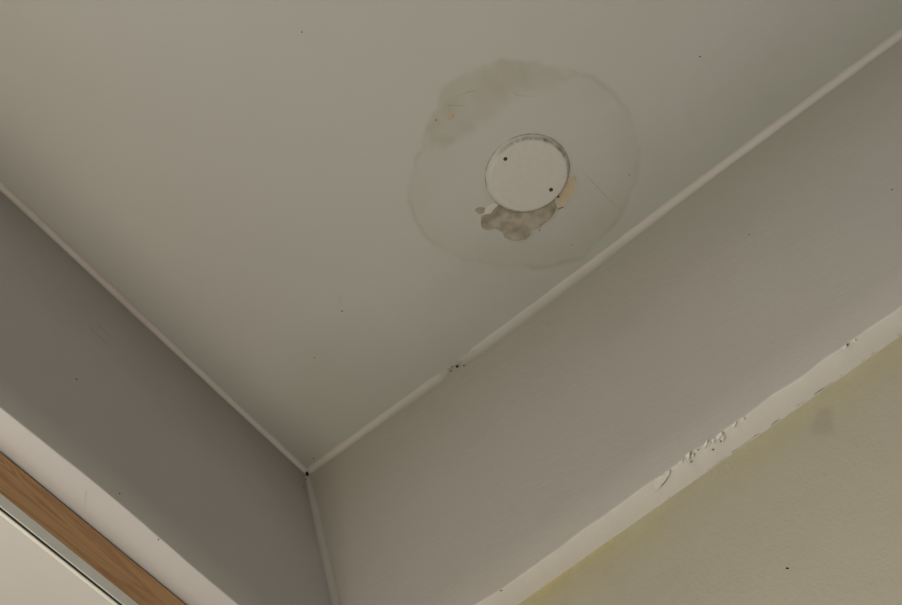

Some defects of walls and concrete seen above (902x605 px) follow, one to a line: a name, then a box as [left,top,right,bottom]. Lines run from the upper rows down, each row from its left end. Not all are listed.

peeling [472,172,579,244]